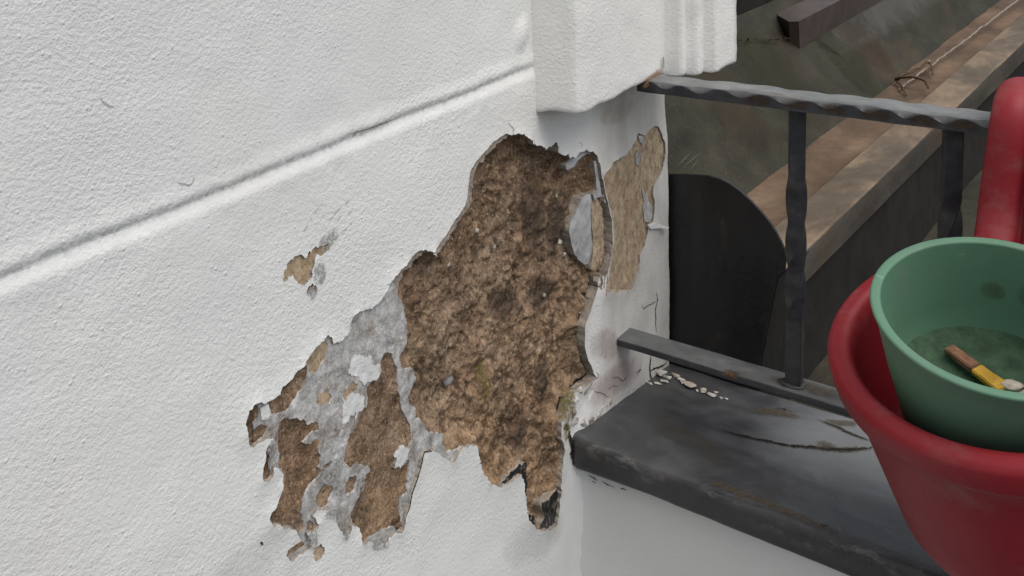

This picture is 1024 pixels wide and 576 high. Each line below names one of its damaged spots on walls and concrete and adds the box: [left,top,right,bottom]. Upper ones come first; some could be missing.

spalling [246,126,669,560]
crack [718,418,872,452]